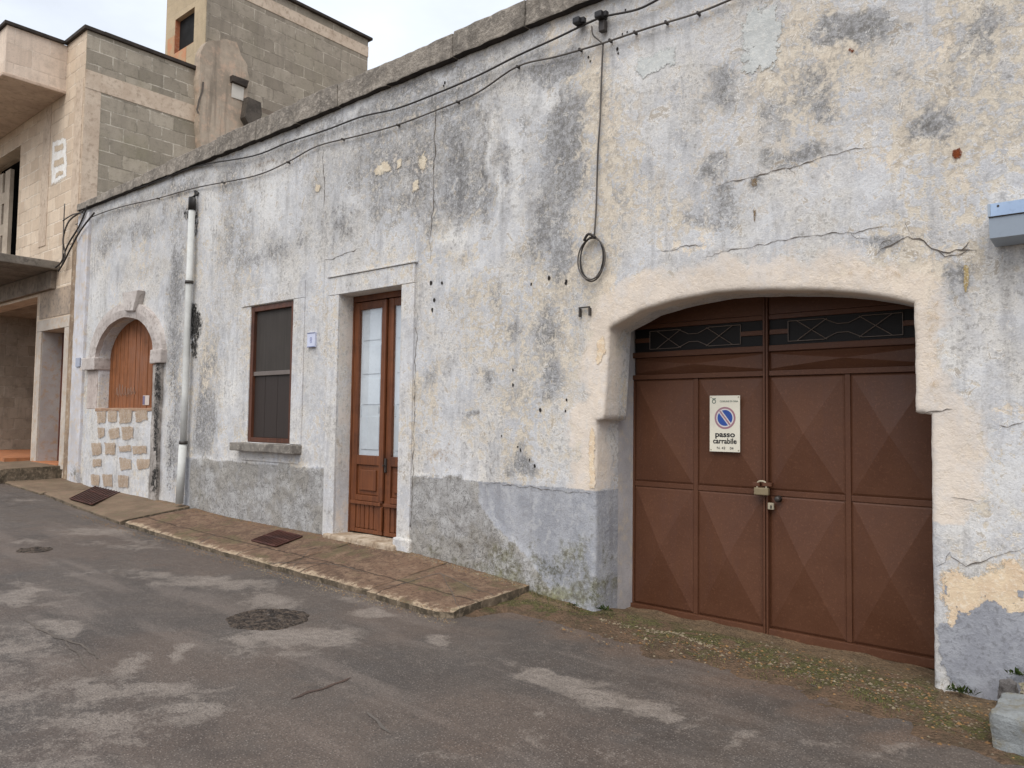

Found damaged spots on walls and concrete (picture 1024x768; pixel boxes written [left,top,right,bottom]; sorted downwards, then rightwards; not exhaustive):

peeling [374,159,402,175]
peeling [412,151,427,192]
crack [716,147,871,187]
crack [655,220,977,258]
damp [180,304,202,358]
damp [151,363,171,493]
flaking render [936,549,1024,757]